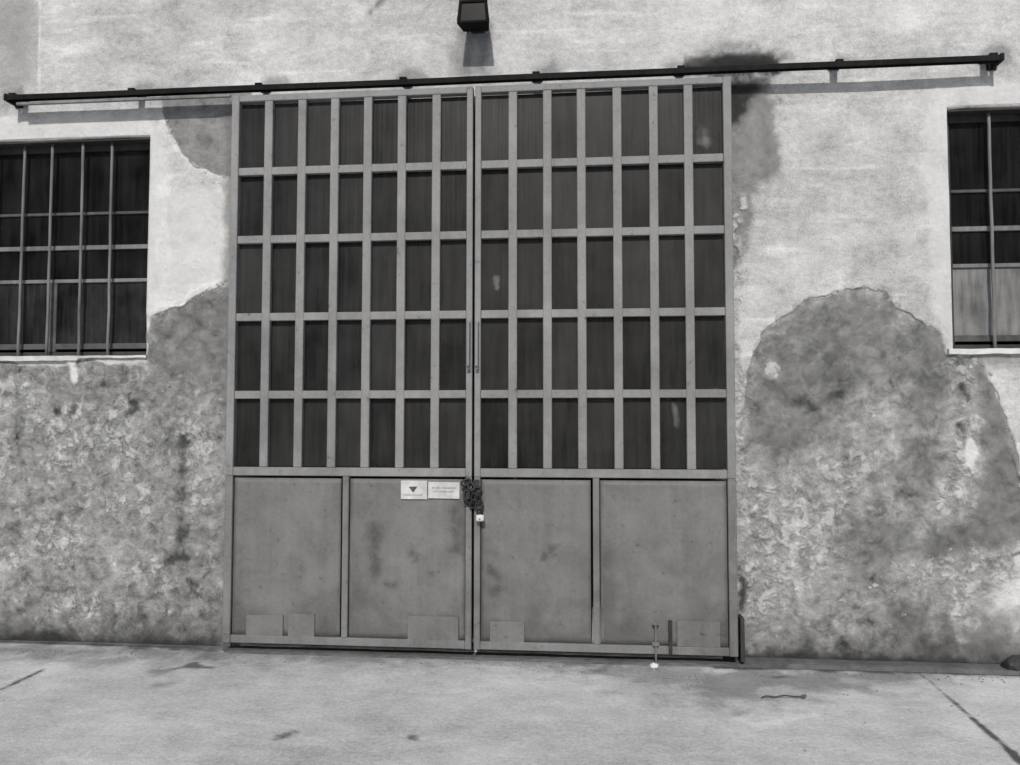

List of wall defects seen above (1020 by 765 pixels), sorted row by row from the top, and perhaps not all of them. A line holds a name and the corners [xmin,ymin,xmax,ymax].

peeling [156,93,252,184]
water stain [684,52,779,274]
peeling [723,193,747,292]
spalling [0,278,229,644]
spalling [720,279,1020,661]